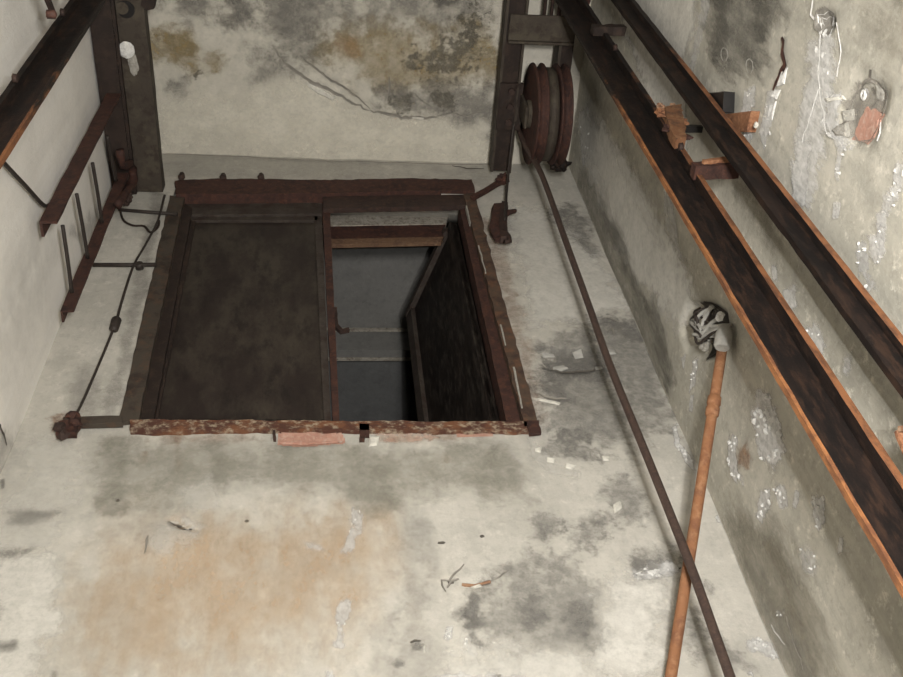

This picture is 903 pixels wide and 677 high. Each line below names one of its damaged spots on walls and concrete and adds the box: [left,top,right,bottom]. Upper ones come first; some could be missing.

crack [272,46,482,121]
leakage [264,0,492,123]
leakage [790,36,836,208]
leakage [856,164,903,291]